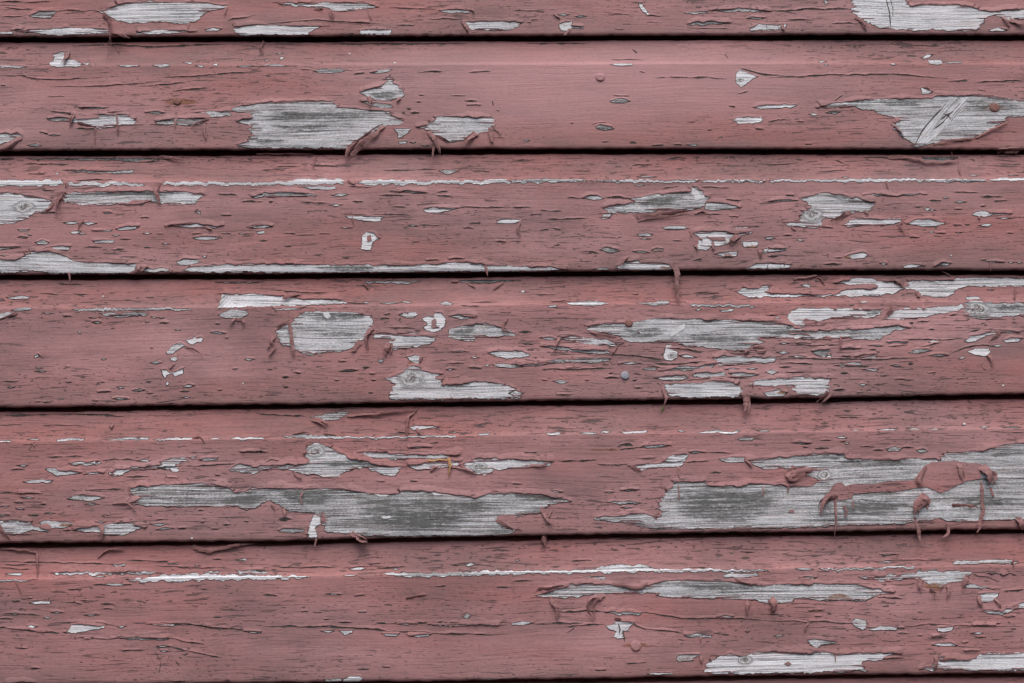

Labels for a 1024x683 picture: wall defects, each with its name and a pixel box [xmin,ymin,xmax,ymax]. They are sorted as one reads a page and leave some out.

peeling [0,0,414,68]
peeling [850,0,1024,33]
peeling [0,68,1024,548]
peeling [50,558,309,586]
peeling [381,551,1024,676]